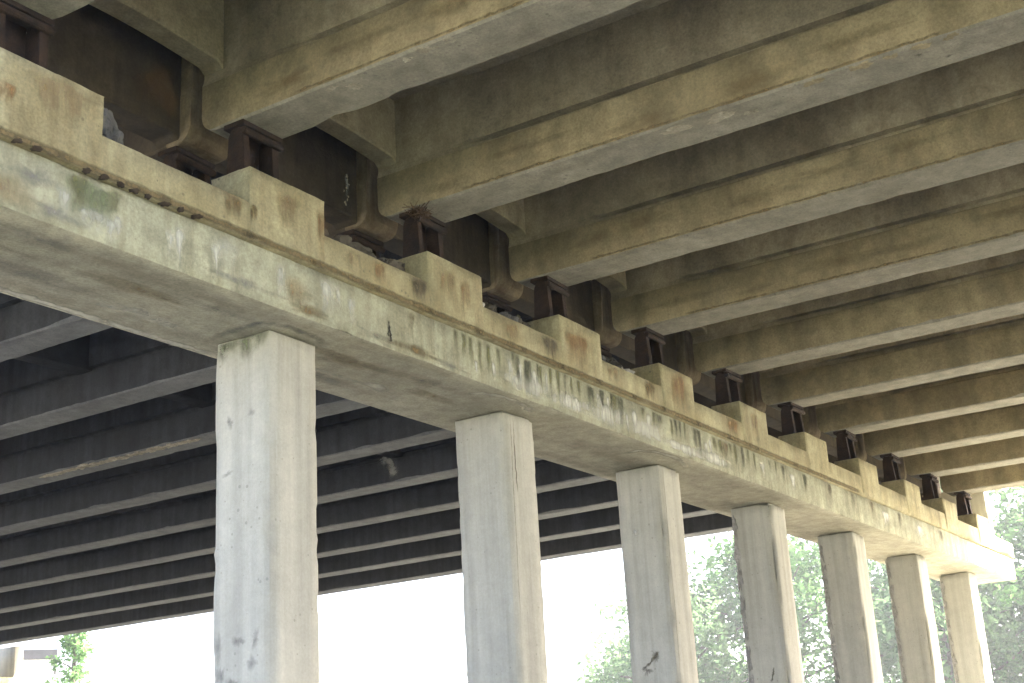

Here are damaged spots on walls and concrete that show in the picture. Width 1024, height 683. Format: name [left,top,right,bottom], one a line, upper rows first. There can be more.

damp [0,127,858,492]